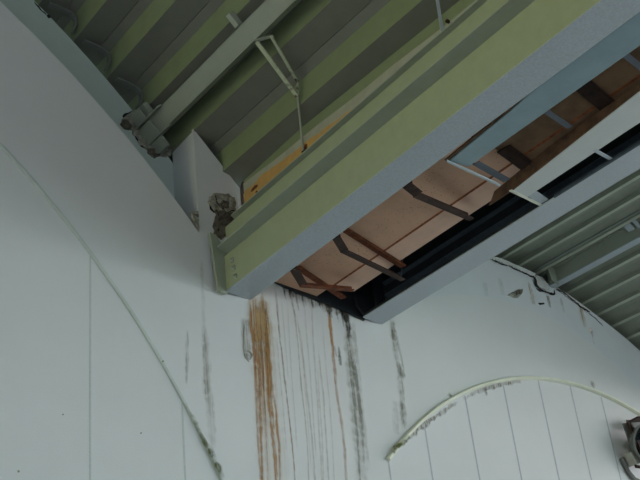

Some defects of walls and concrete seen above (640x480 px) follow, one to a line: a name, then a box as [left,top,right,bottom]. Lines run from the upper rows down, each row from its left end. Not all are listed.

spalling [120,110,172,159]
spalling [208,193,236,240]
crack [492,259,603,326]
corrosion [249,304,280,480]
leakage [349,360,363,433]